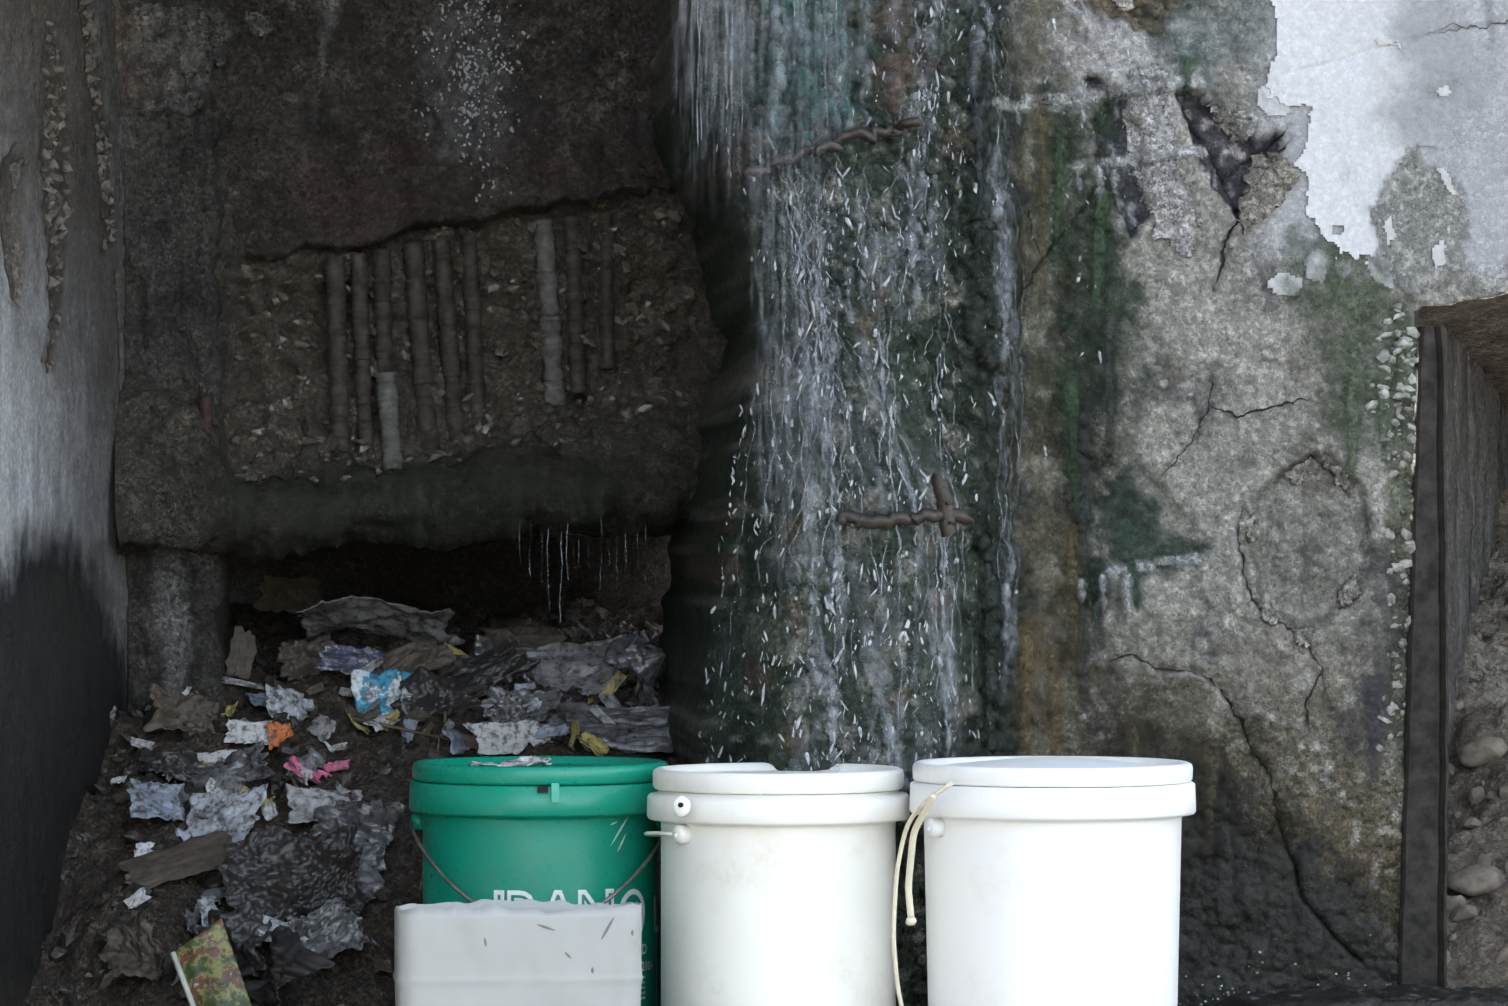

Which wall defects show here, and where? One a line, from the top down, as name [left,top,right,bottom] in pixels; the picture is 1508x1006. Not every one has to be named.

spalling [41,21,73,372]
spalling [79,0,118,252]
damp [767,24,851,173]
crack [1177,97,1288,283]
spalling [231,204,696,484]
rust [834,472,975,537]
peeling [1074,0,1470,760]
crack [1237,512,1325,734]
damp [0,531,129,1006]
crack [1110,654,1296,874]